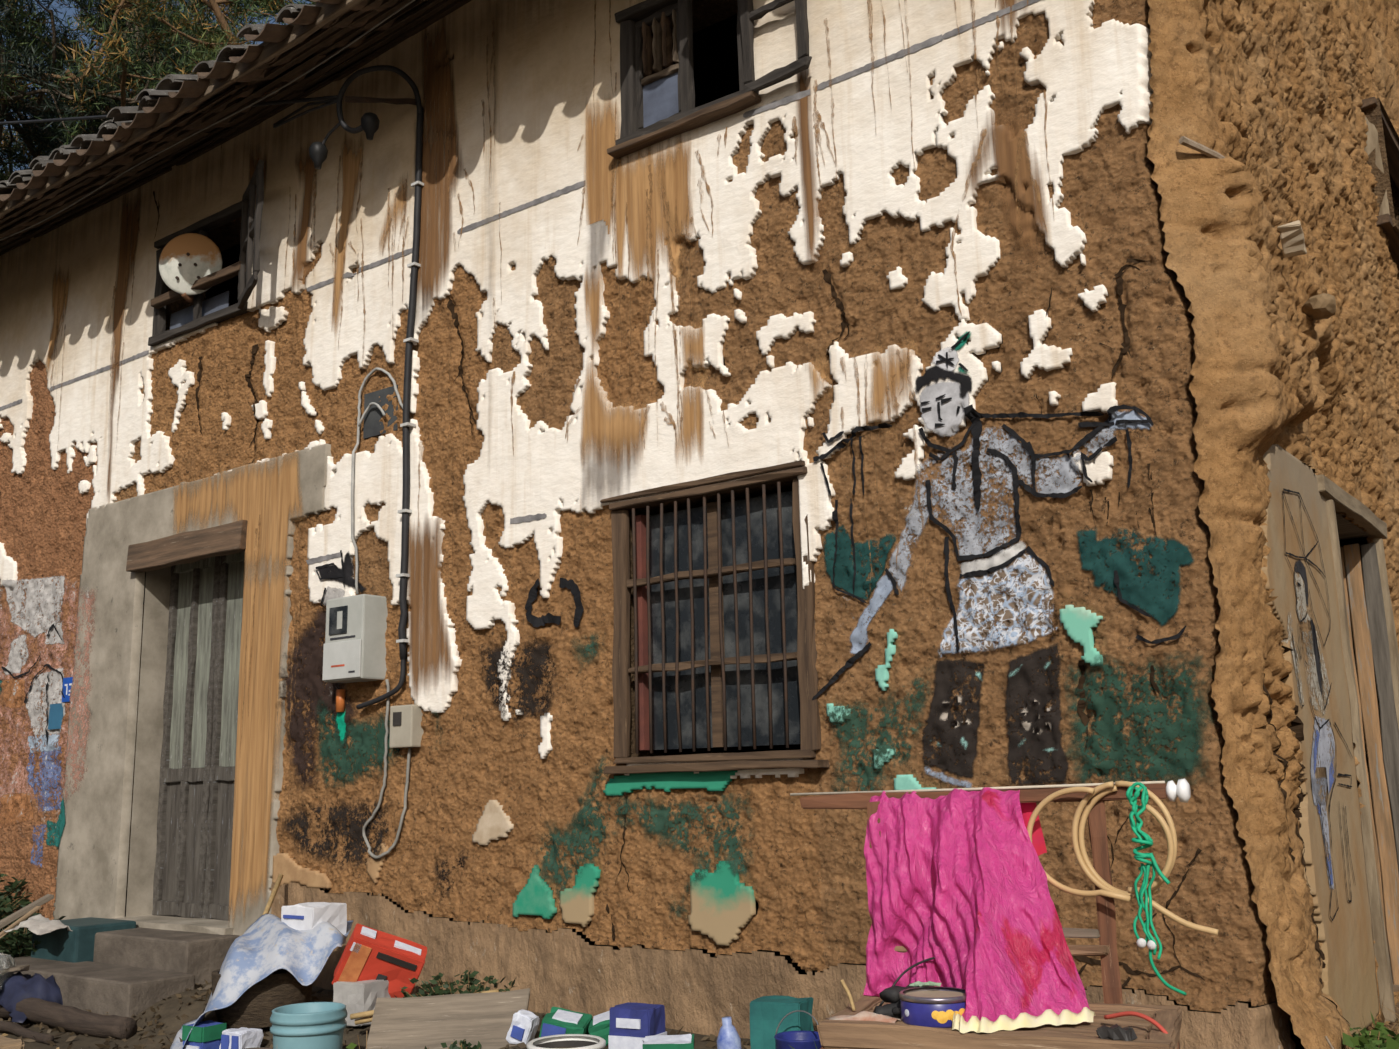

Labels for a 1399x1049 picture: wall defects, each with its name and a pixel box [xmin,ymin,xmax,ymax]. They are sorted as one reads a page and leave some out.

crack [447,297,476,436]
spalling [114,13,1277,1012]
spalling [0,360,97,920]
crack [1107,817,1129,867]
crack [1074,848,1205,989]